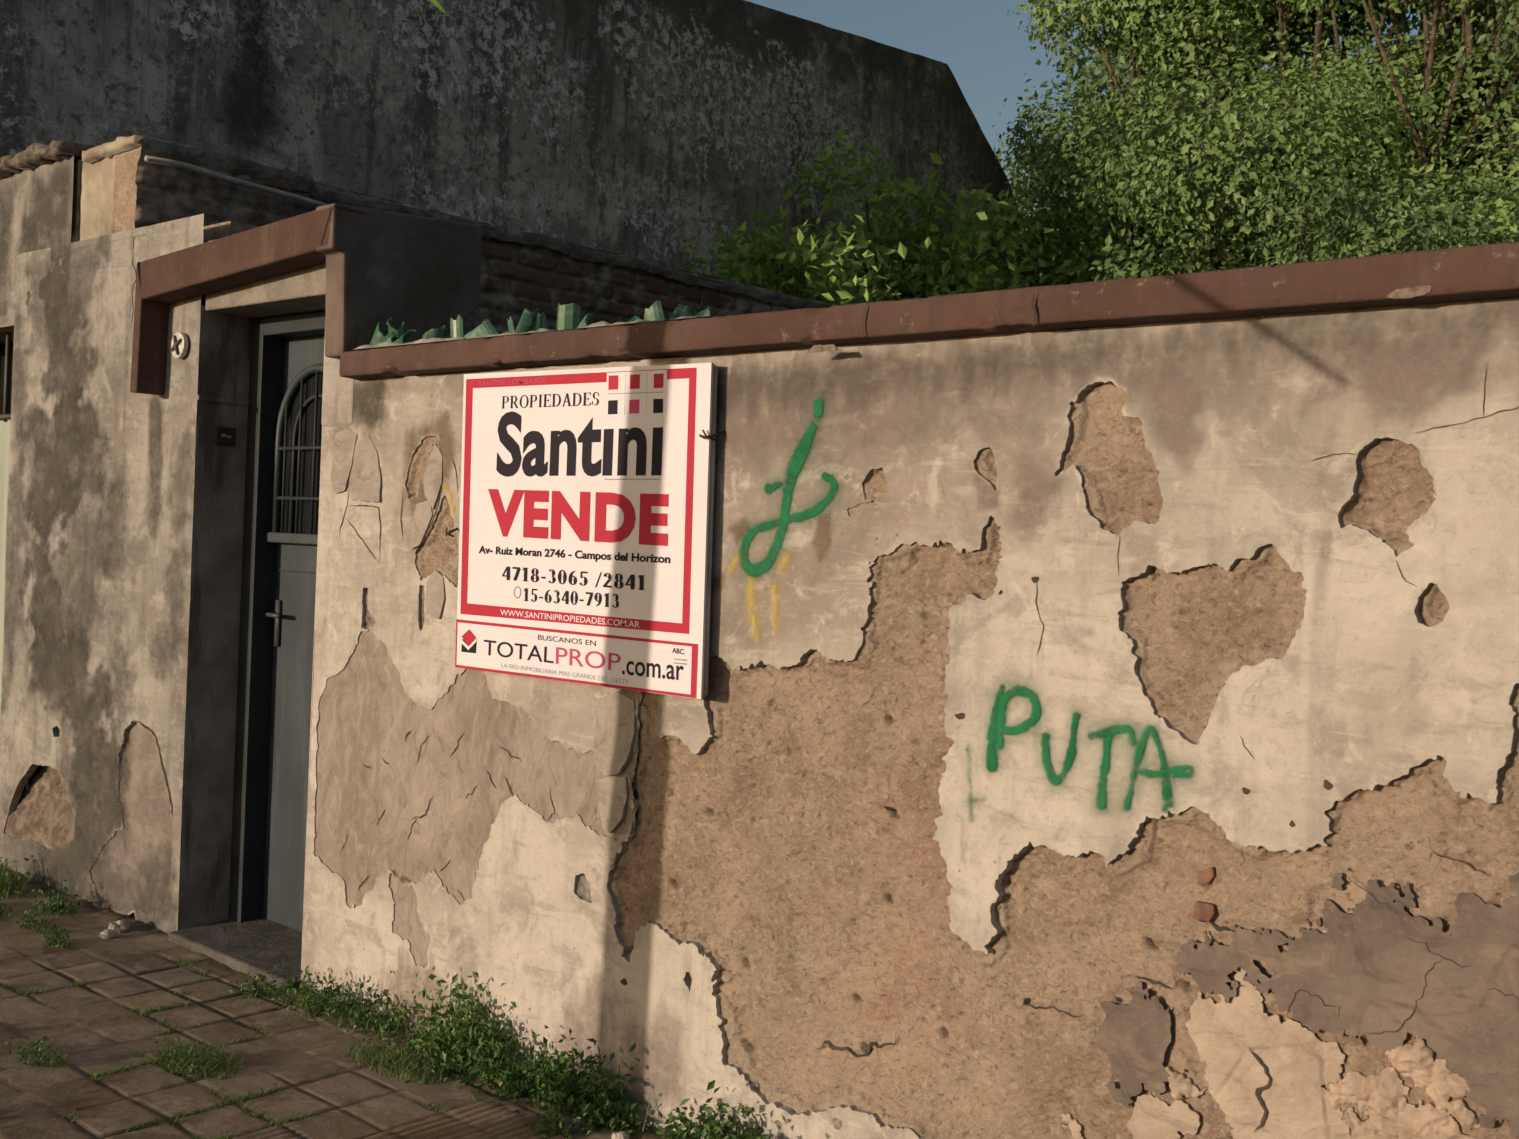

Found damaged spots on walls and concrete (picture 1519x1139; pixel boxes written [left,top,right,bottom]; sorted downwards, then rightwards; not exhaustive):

water stain [0,167,171,926]
water stain [148,398,186,534]
spalling [406,436,459,619]
spalling [1058,382,1163,534]
spalling [1341,438,1436,556]
crack [1409,367,1518,434]
spalling [5,766,75,850]
spalling [314,518,1519,1139]